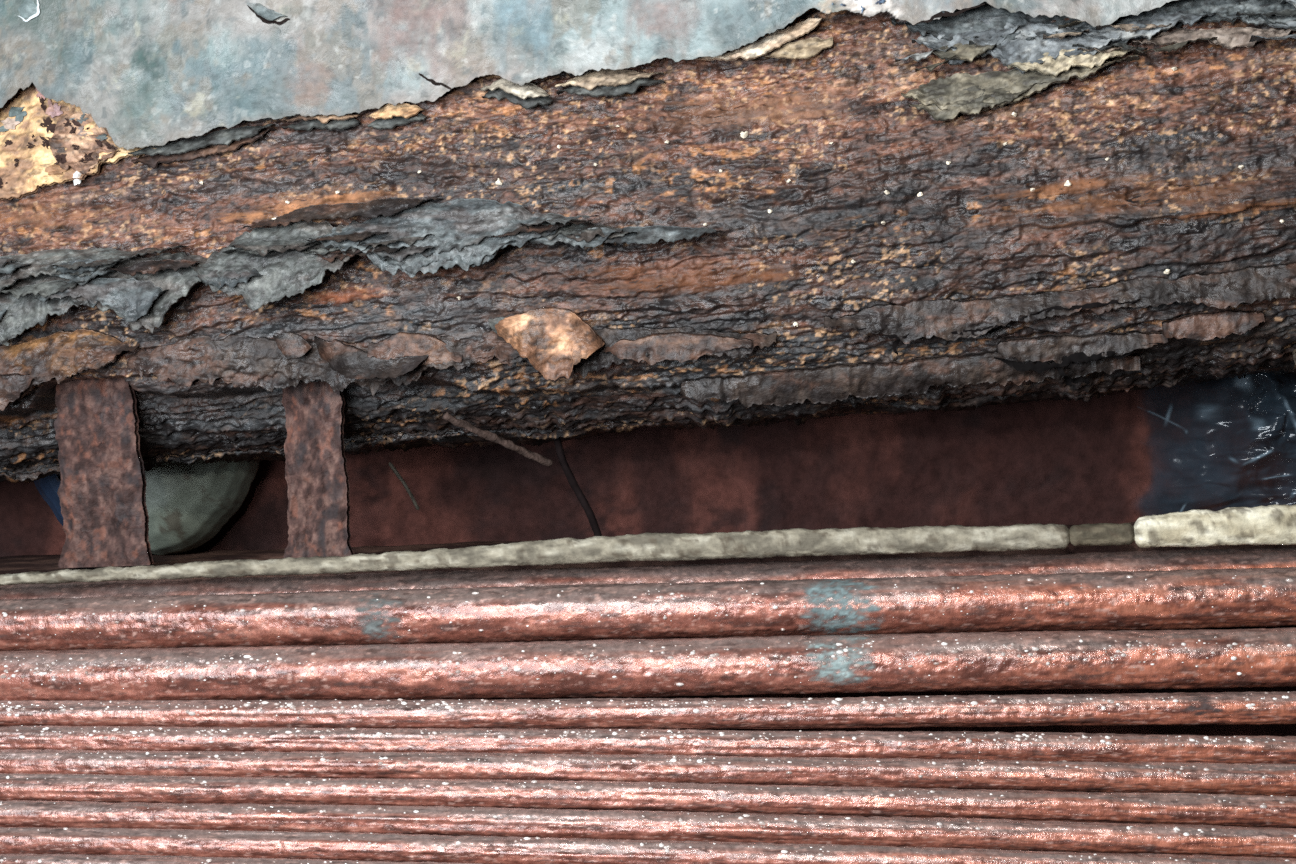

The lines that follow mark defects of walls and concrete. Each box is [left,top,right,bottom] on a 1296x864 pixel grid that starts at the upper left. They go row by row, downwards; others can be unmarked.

peeling [684,0,1296,121]
peeling [0,83,427,200]
rust [225,192,365,221]
rust [1025,180,1105,194]
peeling [0,245,190,322]
peeling [189,197,726,310]
rust [273,332,429,379]
rust [488,307,605,381]